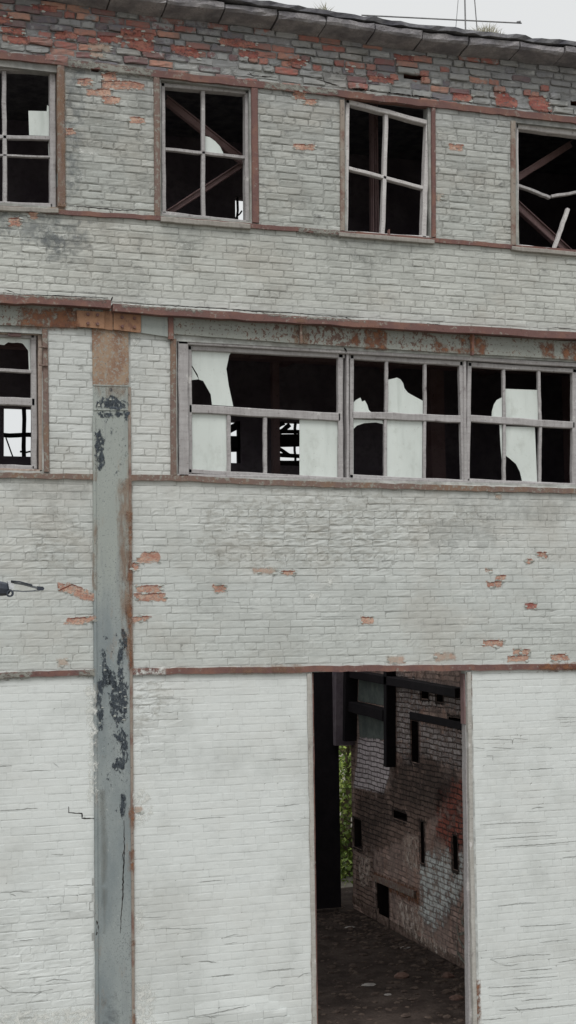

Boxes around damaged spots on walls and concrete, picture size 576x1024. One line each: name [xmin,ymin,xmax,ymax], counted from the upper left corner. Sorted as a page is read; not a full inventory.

flaking render [68,28,156,105]
rust [21,308,79,330]
rust [352,329,387,350]
peeling [94,389,130,472]
flaking render [130,550,161,572]
flaking render [485,568,506,588]
flaking render [57,583,94,601]
flaking render [133,584,168,602]
flaking render [482,639,531,662]
peeling [0,671,31,681]
peeling [79,615,165,816]
crack [66,827,202,935]